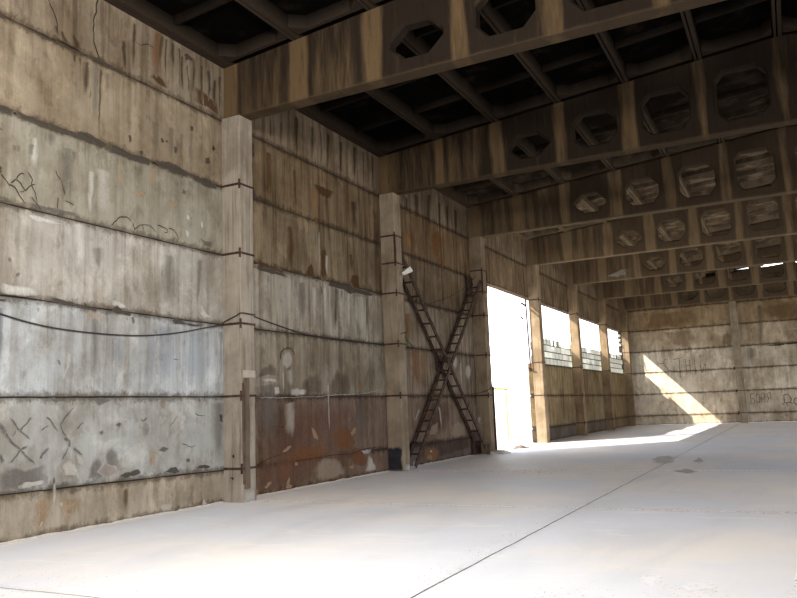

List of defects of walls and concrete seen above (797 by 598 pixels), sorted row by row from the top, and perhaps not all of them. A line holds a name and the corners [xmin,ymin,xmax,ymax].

crack [47,0,100,59]
crack [0,166,73,210]
crack [112,216,179,243]
damp [0,282,39,297]
damp [85,313,104,383]
damp [146,325,224,387]
crack [0,407,84,466]
corrosion [256,402,367,495]